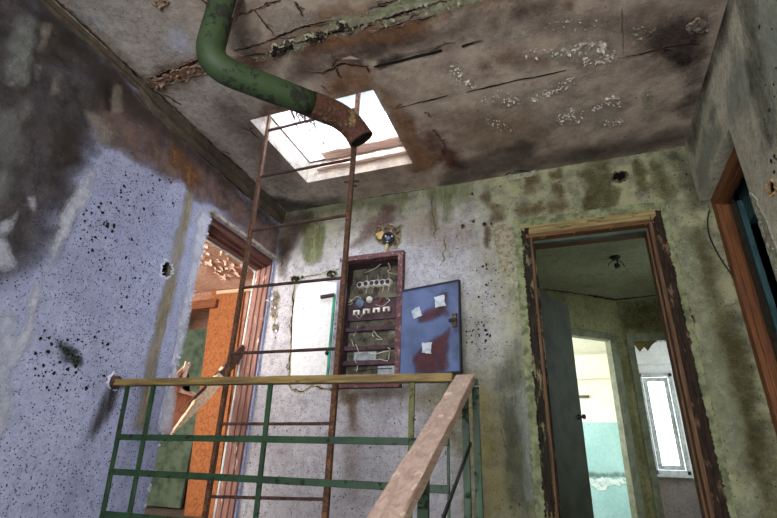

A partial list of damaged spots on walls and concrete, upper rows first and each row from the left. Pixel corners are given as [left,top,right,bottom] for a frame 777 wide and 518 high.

crack [234,0,456,59]
peeling [251,0,478,61]
leakage [654,5,727,67]
crack [308,56,371,93]
crack [468,70,566,92]
crack [397,95,456,157]
leakage [566,147,619,210]
spalling [610,170,629,184]
leakage [0,0,287,435]
leakage [481,194,503,247]
spalling [119,237,174,315]
spalling [158,212,254,434]